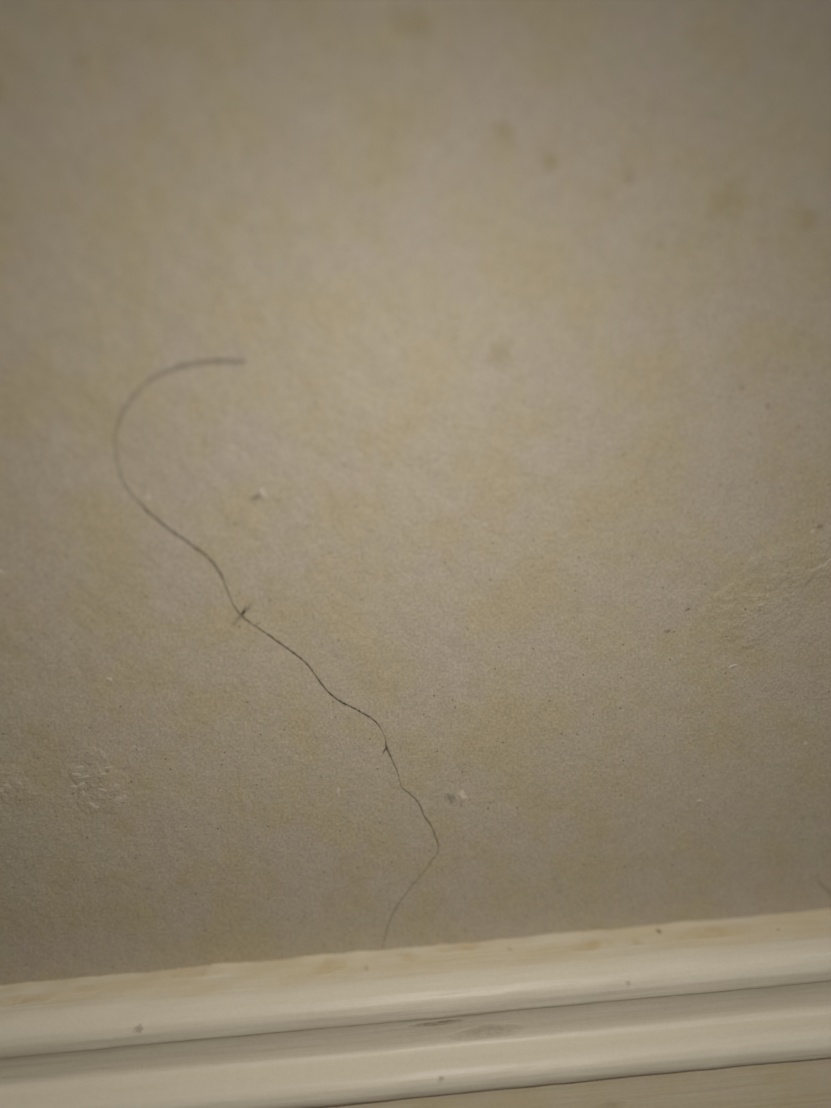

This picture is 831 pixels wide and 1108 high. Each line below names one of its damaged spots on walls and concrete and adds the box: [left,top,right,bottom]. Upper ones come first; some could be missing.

crack [113,357,439,950]